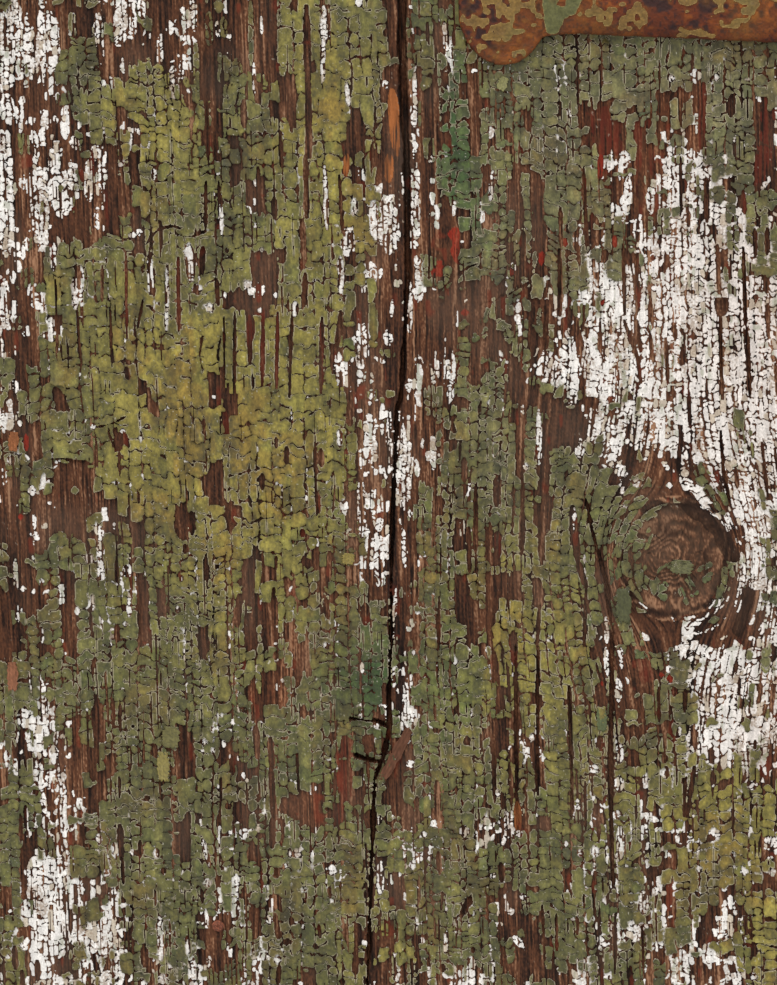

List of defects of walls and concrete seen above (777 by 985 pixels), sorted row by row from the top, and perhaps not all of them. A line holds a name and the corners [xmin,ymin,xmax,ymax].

peeling [0,0,146,467]
peeling [255,247,289,309]
crack [437,263,481,295]
peeling [338,0,777,761]
peeling [37,450,108,544]
crack [349,0,413,985]
peeling [60,576,81,659]
peeling [237,547,365,855]
peeling [6,662,182,985]
peeling [202,897,318,985]
crack [453,894,473,919]
peeling [406,887,733,985]